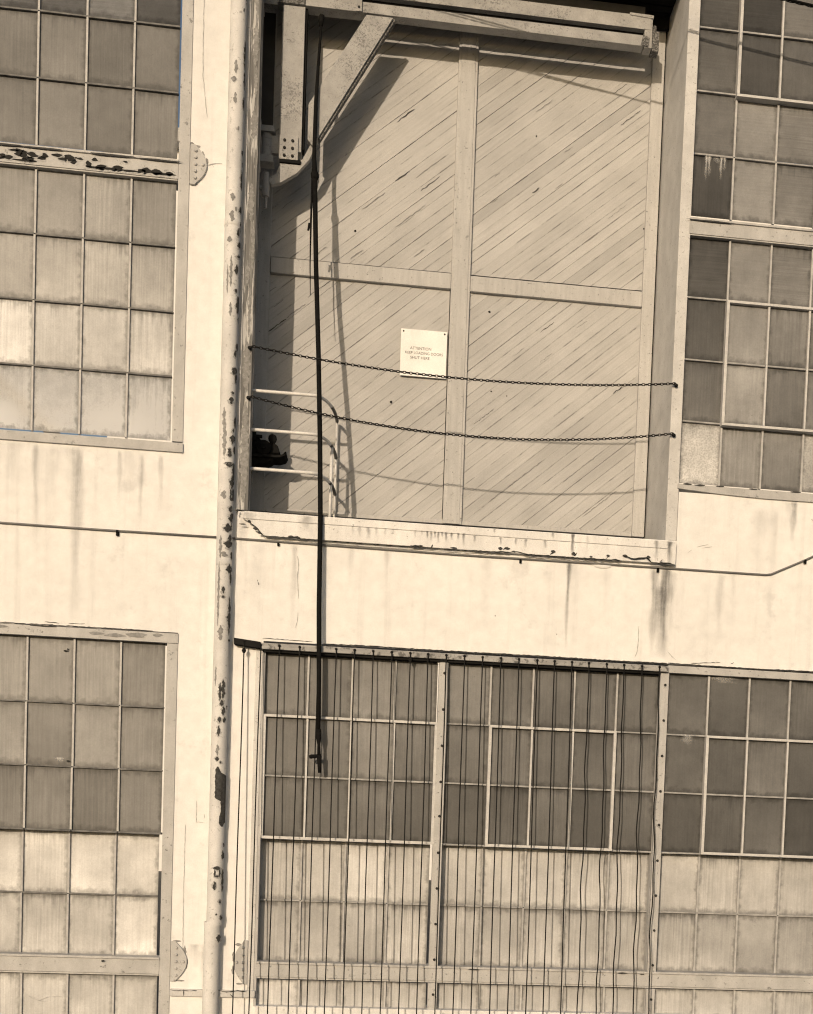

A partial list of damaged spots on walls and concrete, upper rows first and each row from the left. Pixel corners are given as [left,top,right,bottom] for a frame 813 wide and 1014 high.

peeling [231,23,260,139]
peeling [0,143,179,177]
peeling [214,667,227,827]